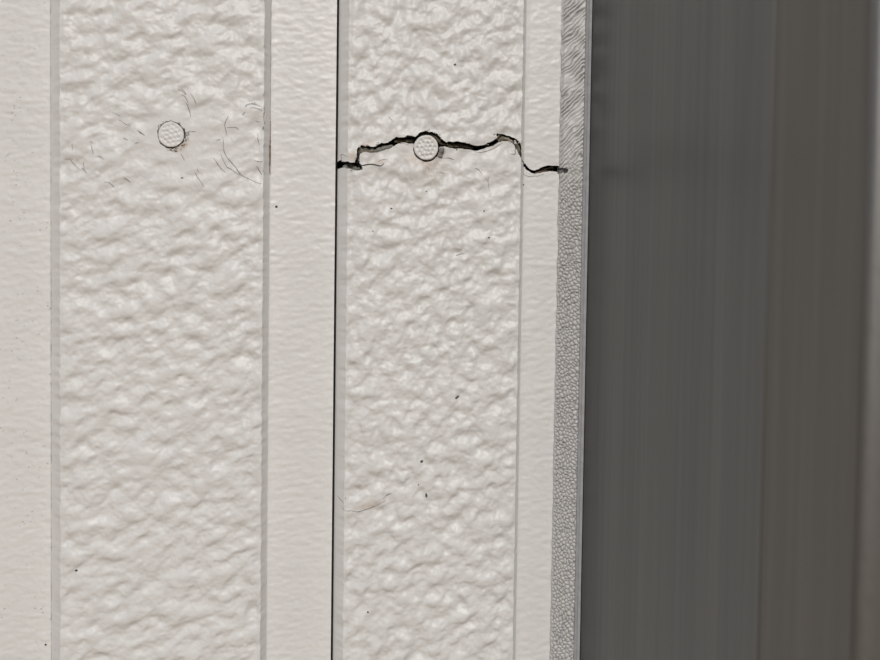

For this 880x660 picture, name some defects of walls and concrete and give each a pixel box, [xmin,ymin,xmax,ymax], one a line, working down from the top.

crack [337,116,583,660]